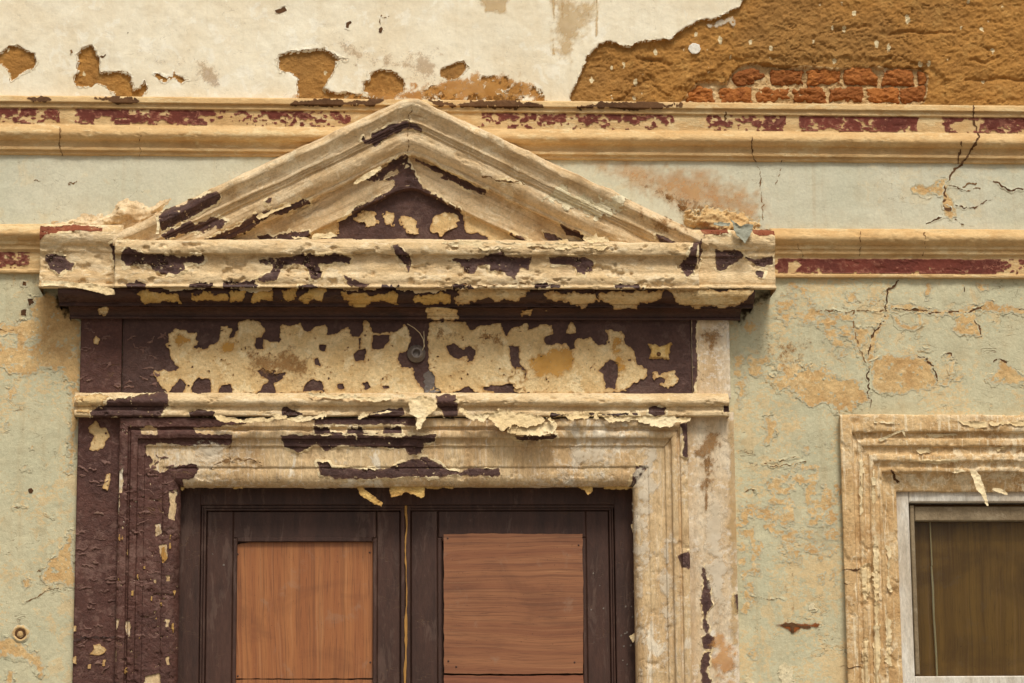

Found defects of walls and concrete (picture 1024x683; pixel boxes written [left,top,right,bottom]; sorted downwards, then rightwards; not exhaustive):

spalling [0,43,39,82]
spalling [420,0,1024,133]
peeling [358,119,424,147]
crack [922,105,1024,256]
crack [820,278,984,407]
peeling [0,152,1024,683]
rust [780,622,819,633]